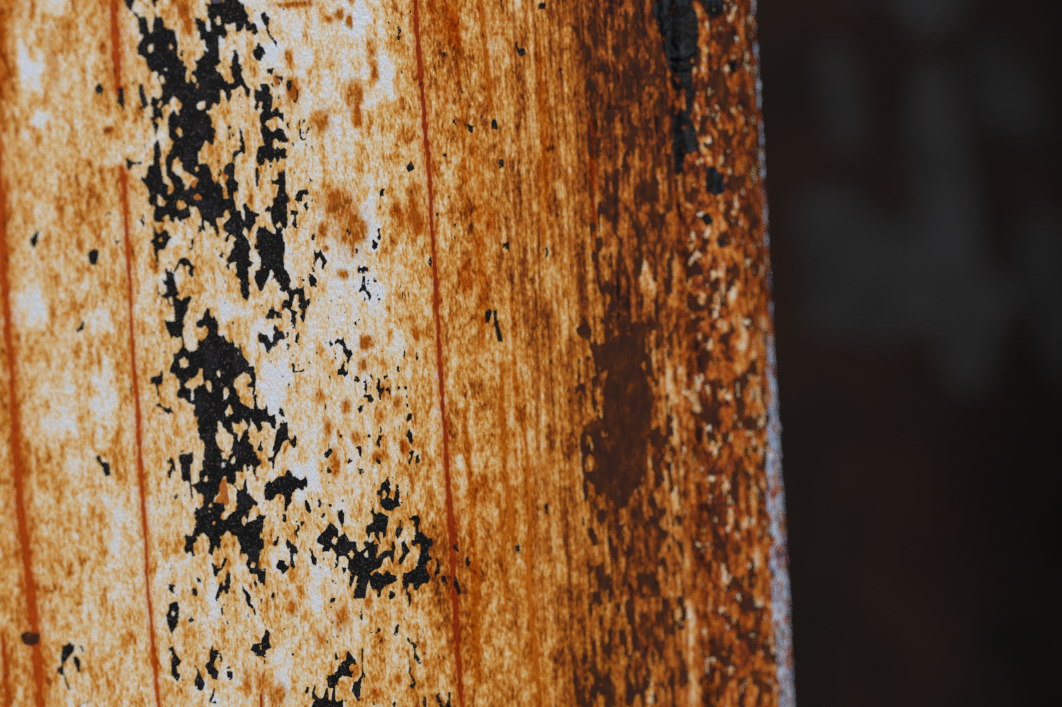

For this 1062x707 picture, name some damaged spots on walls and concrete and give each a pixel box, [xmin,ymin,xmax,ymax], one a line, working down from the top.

corrosion [110,0,121,97]
peeling [645,0,733,183]
corrosion [0,147,45,707]
peeling [57,642,84,690]
corrosion [119,166,160,707]
peeling [166,584,233,704]
peeling [251,628,285,664]
peeling [114,0,461,624]
peeling [305,621,366,707]
corrosion [396,0,464,707]
corrosion [498,363,542,707]
corrosion [571,0,787,707]